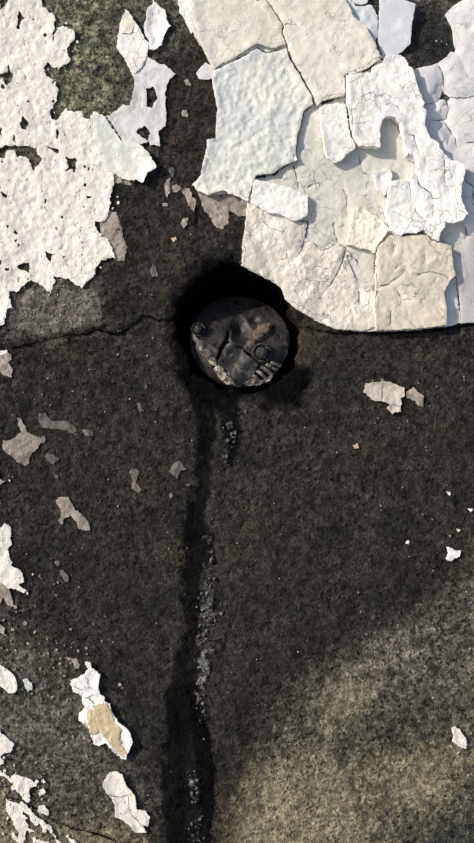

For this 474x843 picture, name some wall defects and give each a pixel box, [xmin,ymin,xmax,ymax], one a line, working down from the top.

peeling [0,0,175,337]
peeling [162,0,474,332]
crack [2,315,175,350]
peeling [2,413,93,479]
damp [0,43,293,780]
peeling [364,379,424,414]
peeling [0,523,27,607]
peeling [56,497,90,531]
damp [154,301,474,843]
peeling [64,657,133,760]
peeling [0,731,77,843]
peeling [102,771,150,833]